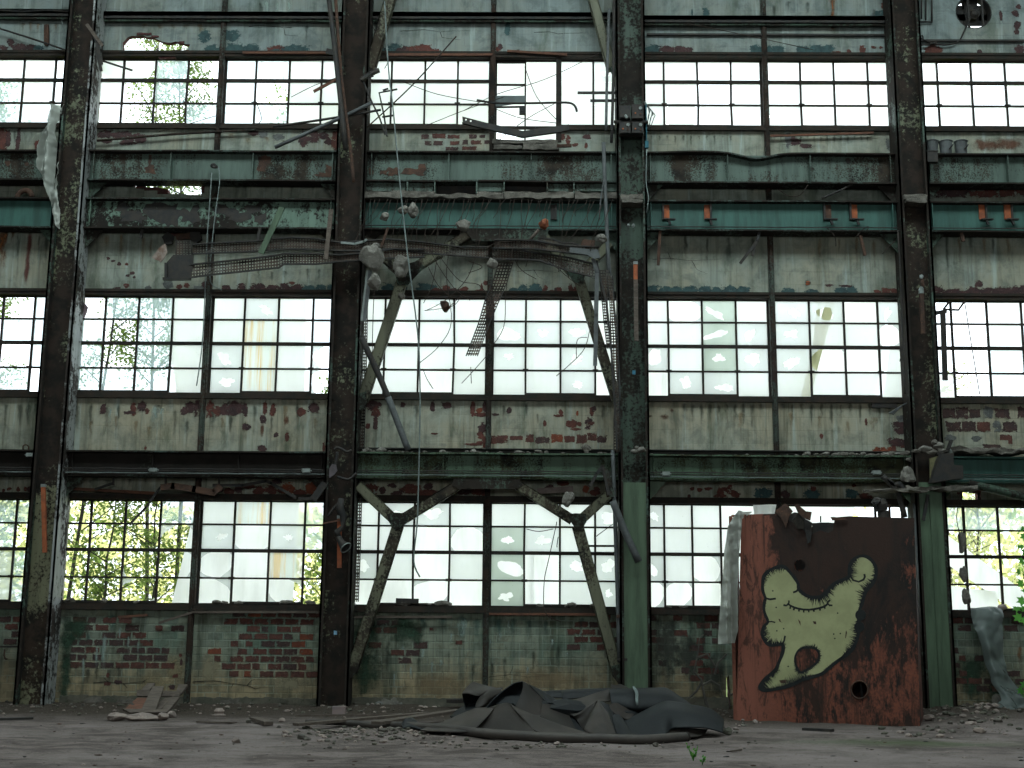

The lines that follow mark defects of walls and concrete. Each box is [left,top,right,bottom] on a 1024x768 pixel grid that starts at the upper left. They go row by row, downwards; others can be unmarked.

peeling [421,133,489,151]
spalling [136,186,170,194]
peeling [124,400,150,416]
peeling [180,399,289,451]
peeling [297,401,320,417]
peeling [365,400,382,431]
flaking render [463,400,607,448]
flaking render [942,406,1024,448]